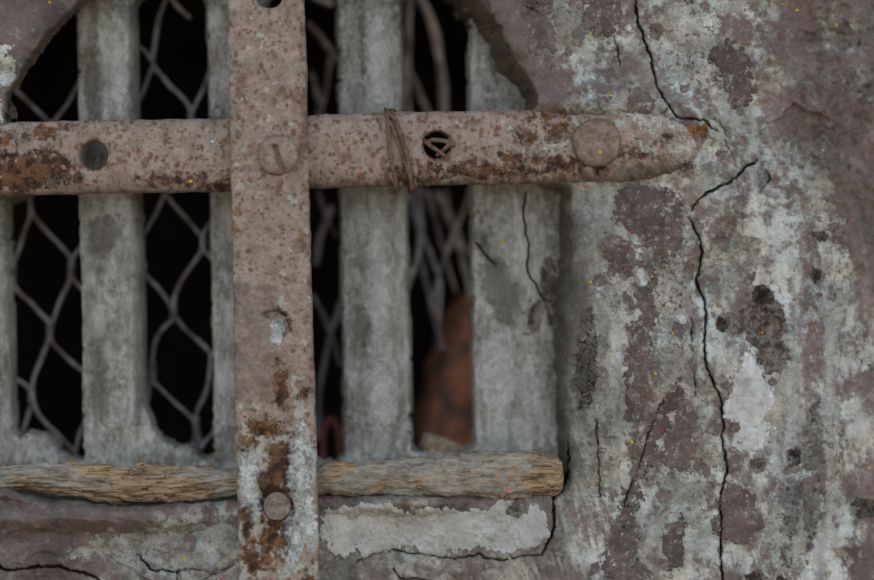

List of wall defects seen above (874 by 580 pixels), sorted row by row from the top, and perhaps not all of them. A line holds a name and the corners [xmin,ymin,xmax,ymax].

spalling [0,13,79,143]
rust [0,123,83,195]
spalling [138,0,209,120]
spalling [402,0,469,112]
rust [387,112,609,185]
rust [660,123,709,143]
spalling [7,174,85,457]
spalling [143,192,215,454]
crack [635,1,770,580]
crack [0,565,98,580]
rust [238,357,313,580]
crack [394,442,571,580]